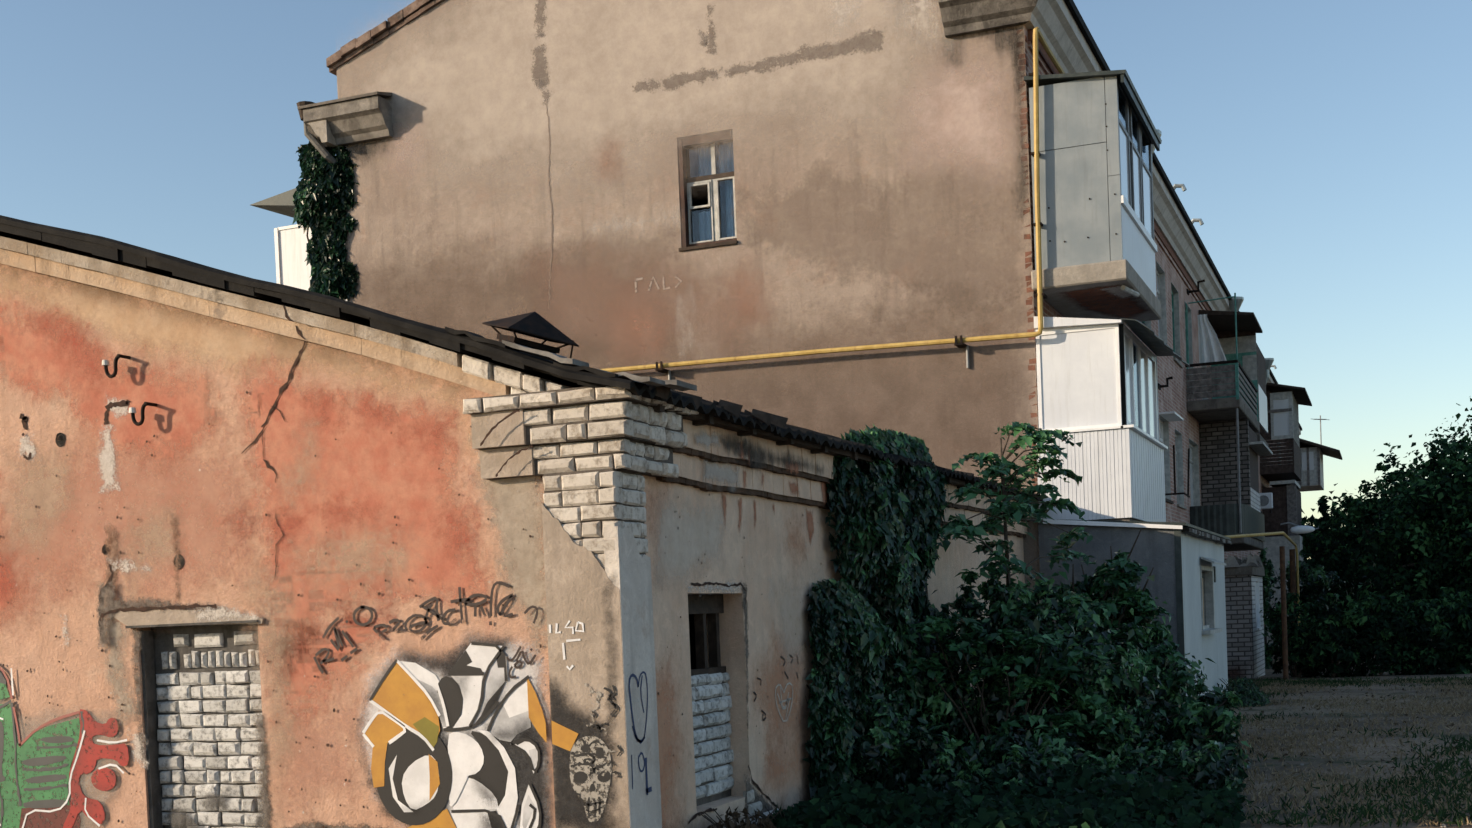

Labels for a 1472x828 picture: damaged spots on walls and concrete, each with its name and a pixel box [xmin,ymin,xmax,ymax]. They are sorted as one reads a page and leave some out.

crack [242,305,306,575]
peeling [0,271,690,828]
spalling [688,554,758,704]